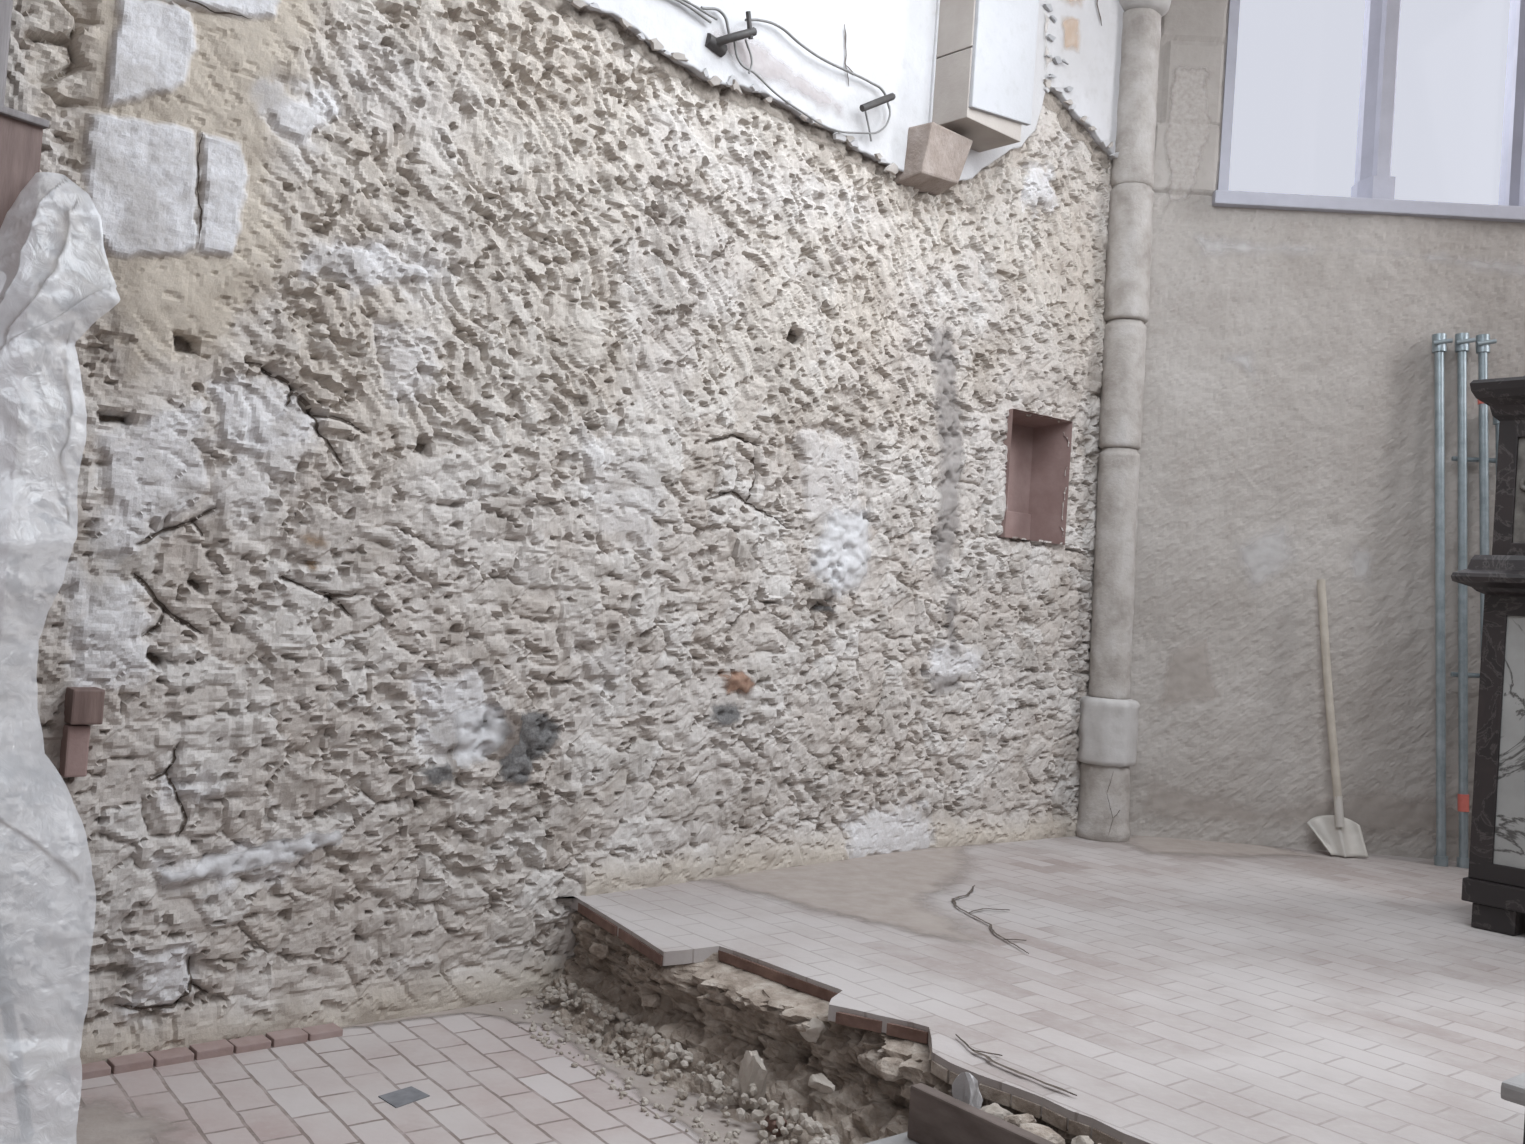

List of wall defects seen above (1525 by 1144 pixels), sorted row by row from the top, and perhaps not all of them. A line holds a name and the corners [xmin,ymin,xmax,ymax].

spalling [535,0,899,179]
spalling [1042,4,1119,173]
crack [244,362,365,464]
crack [134,507,217,636]
crack [280,574,356,616]
crack [149,747,188,836]
crack [951,885,1029,954]
crack [114,956,208,1011]